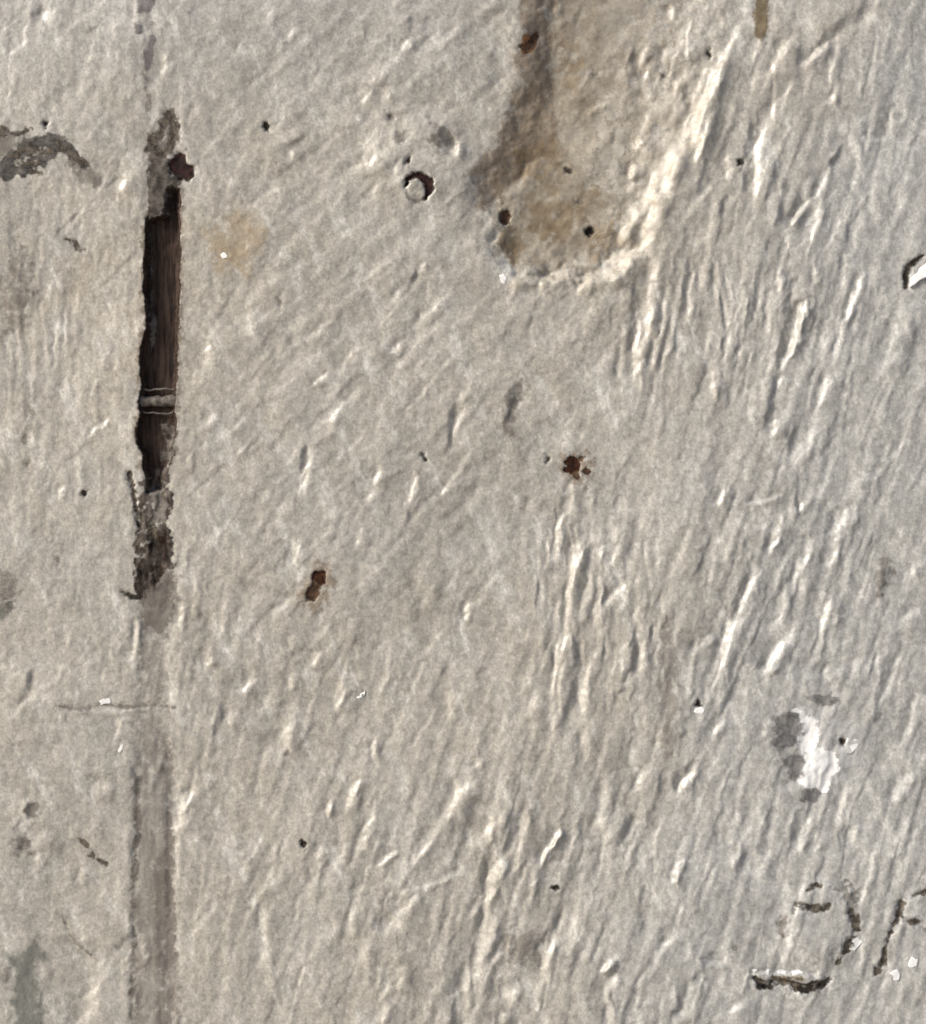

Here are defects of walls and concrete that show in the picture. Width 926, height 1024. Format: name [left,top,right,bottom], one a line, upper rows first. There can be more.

rust [520,32,539,54]
peeling [144,108,181,219]
rust [169,152,194,181]
peeling [902,255,926,289]
peeling [771,694,876,803]
peeling [890,957,918,981]